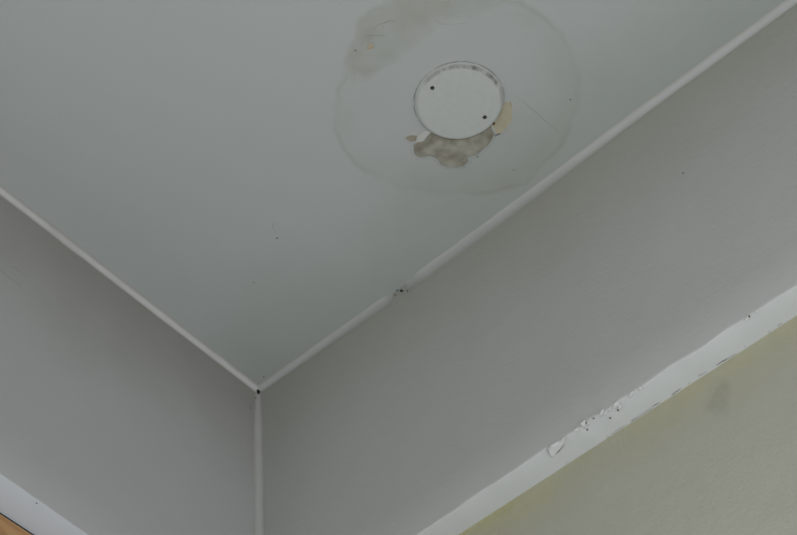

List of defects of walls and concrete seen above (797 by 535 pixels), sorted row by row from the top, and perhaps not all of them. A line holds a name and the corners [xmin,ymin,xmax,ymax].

peeling [403,98,516,171]